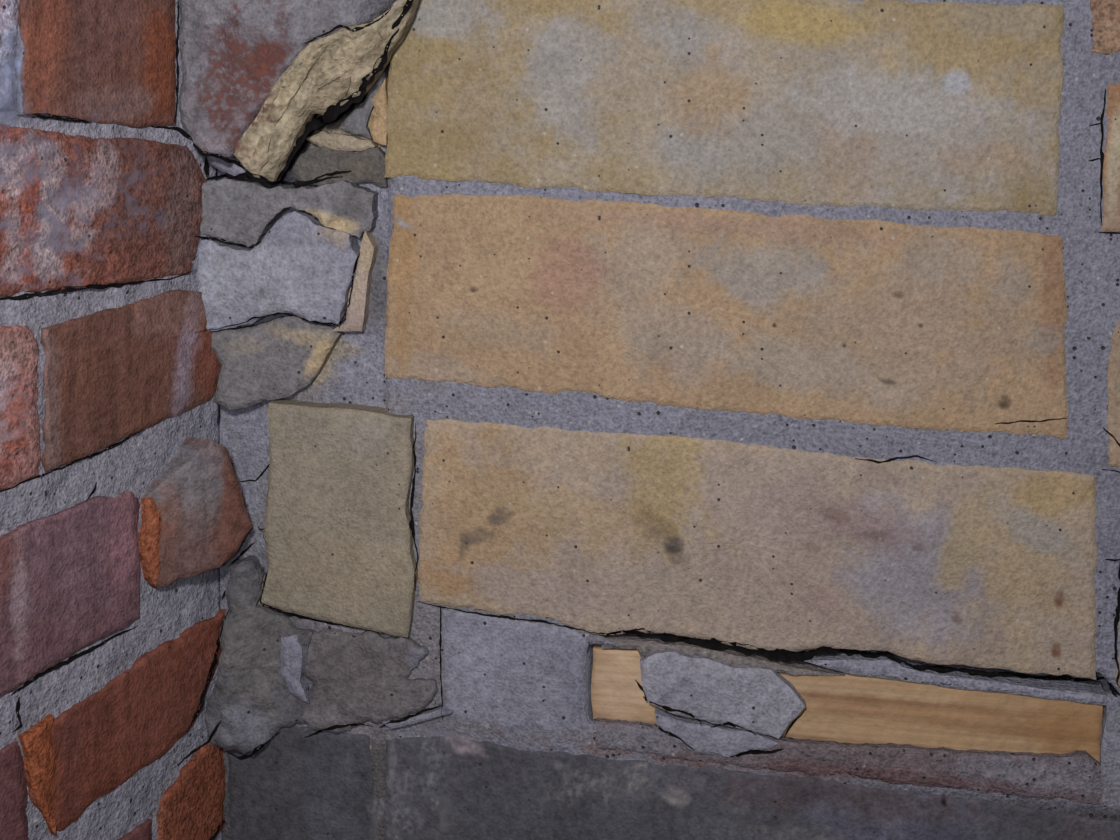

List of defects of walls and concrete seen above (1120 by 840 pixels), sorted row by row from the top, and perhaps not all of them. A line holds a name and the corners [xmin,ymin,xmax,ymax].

crack [150,0,413,188]
crack [171,423,1120,771]
peeling [640,648,805,757]